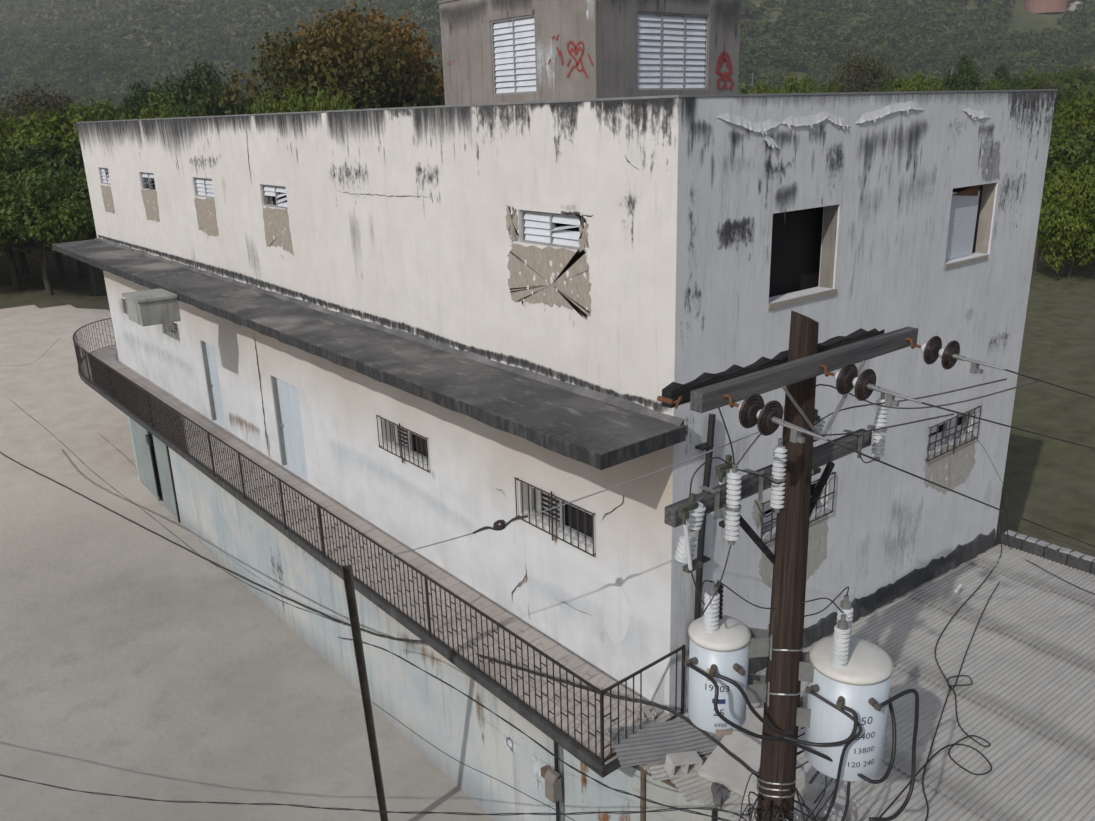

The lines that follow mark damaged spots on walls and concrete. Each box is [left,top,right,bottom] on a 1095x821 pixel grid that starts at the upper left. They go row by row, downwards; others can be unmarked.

water stain [74,98,710,157]
water stain [759,133,796,213]
peeling [716,101,924,149]
water stain [827,145,844,171]
water stain [864,124,926,178]
water stain [951,91,1056,137]
peeling [141,189,160,222]
peeling [194,197,218,236]
peeling [263,207,294,259]
water stain [718,218,754,248]
peeling [506,205,591,326]
peeling [806,513,828,581]